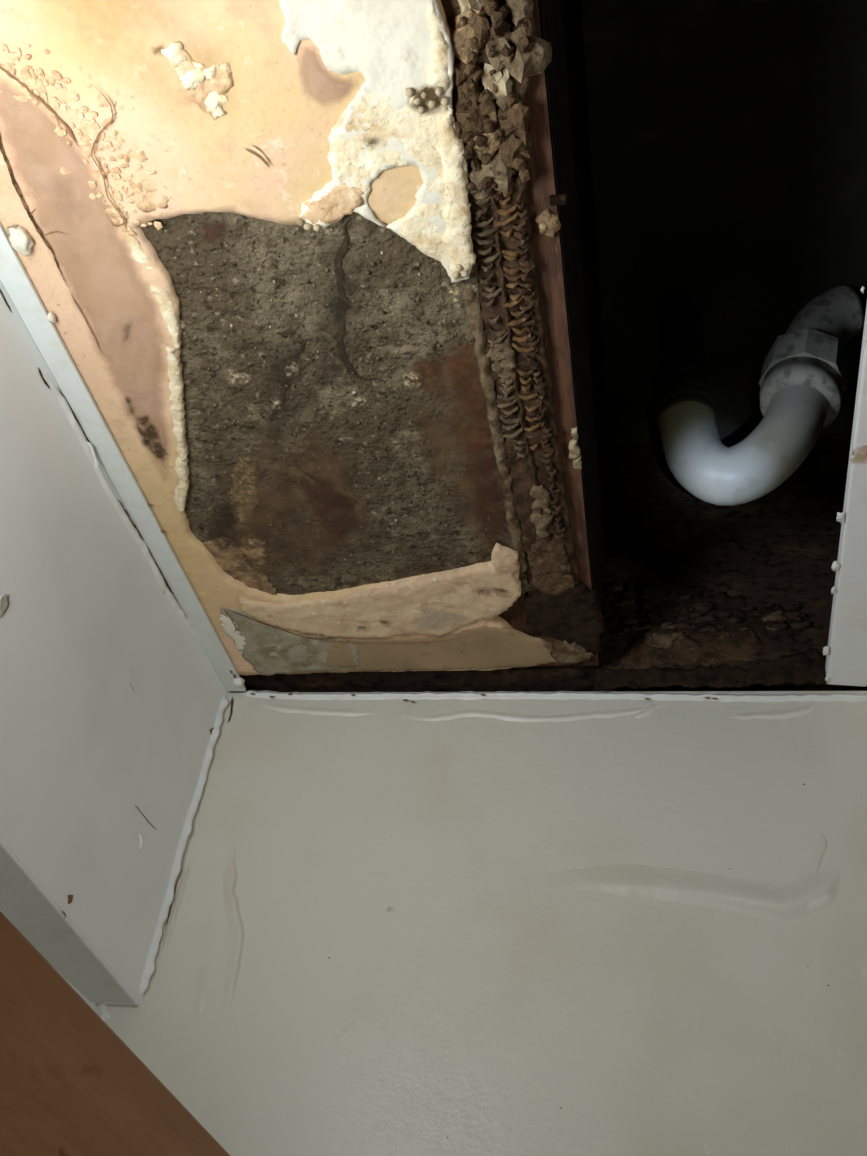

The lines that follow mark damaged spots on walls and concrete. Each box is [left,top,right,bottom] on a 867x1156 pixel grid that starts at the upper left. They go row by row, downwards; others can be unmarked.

flaking render [0,0,563,675]
peeling [139,575,867,999]